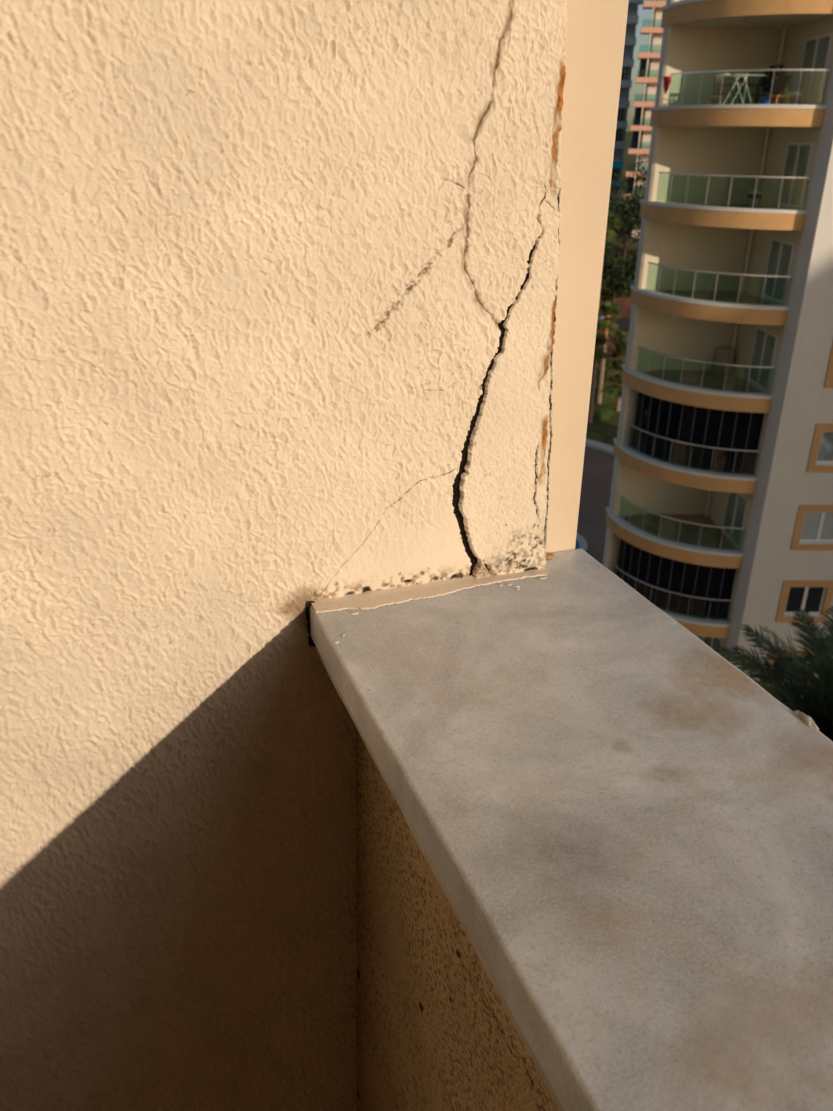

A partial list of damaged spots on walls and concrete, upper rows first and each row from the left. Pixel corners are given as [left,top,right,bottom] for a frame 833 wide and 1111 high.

crack [362,103,561,576]